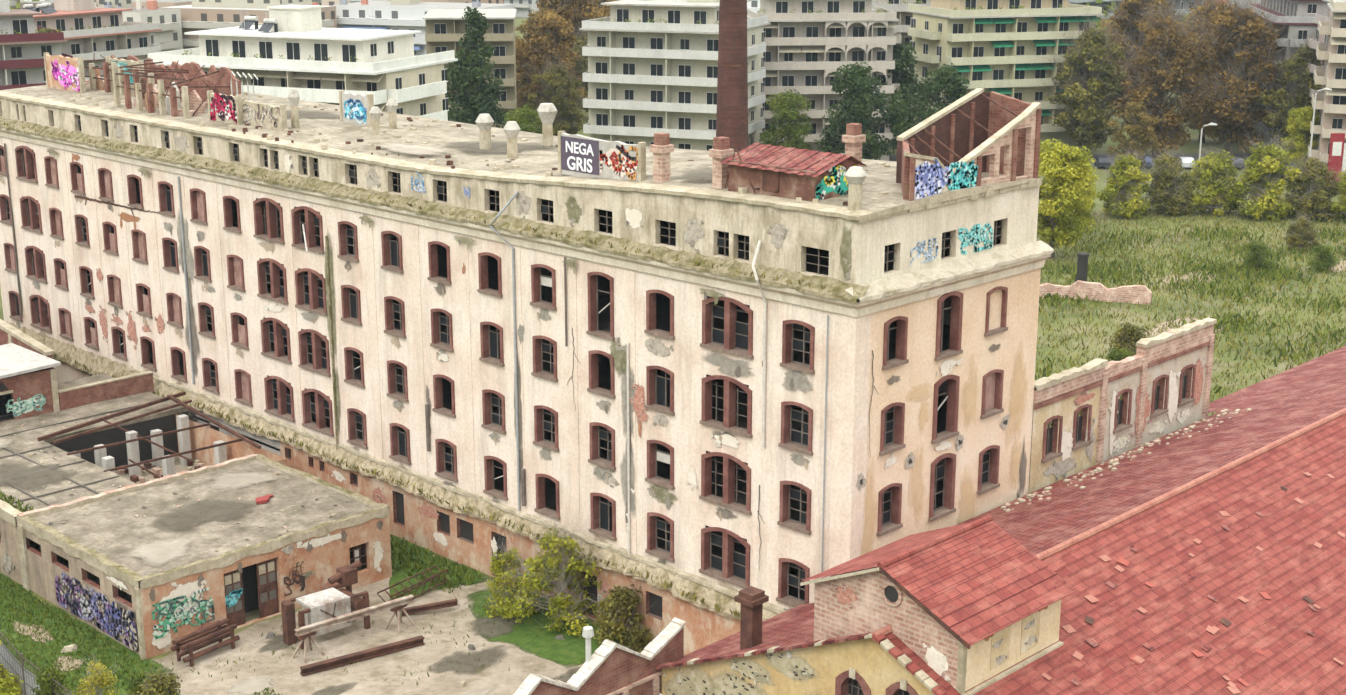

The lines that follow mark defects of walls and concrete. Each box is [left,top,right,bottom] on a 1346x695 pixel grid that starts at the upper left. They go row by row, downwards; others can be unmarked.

damp [676,167,712,180]
damp [514,309,551,480]
damp [595,353,635,530]
flaking render [630,383,668,437]
flaking render [1044,359,1207,479]
damp [134,473,272,564]
damp [717,508,736,520]
flaking render [663,650,815,695]